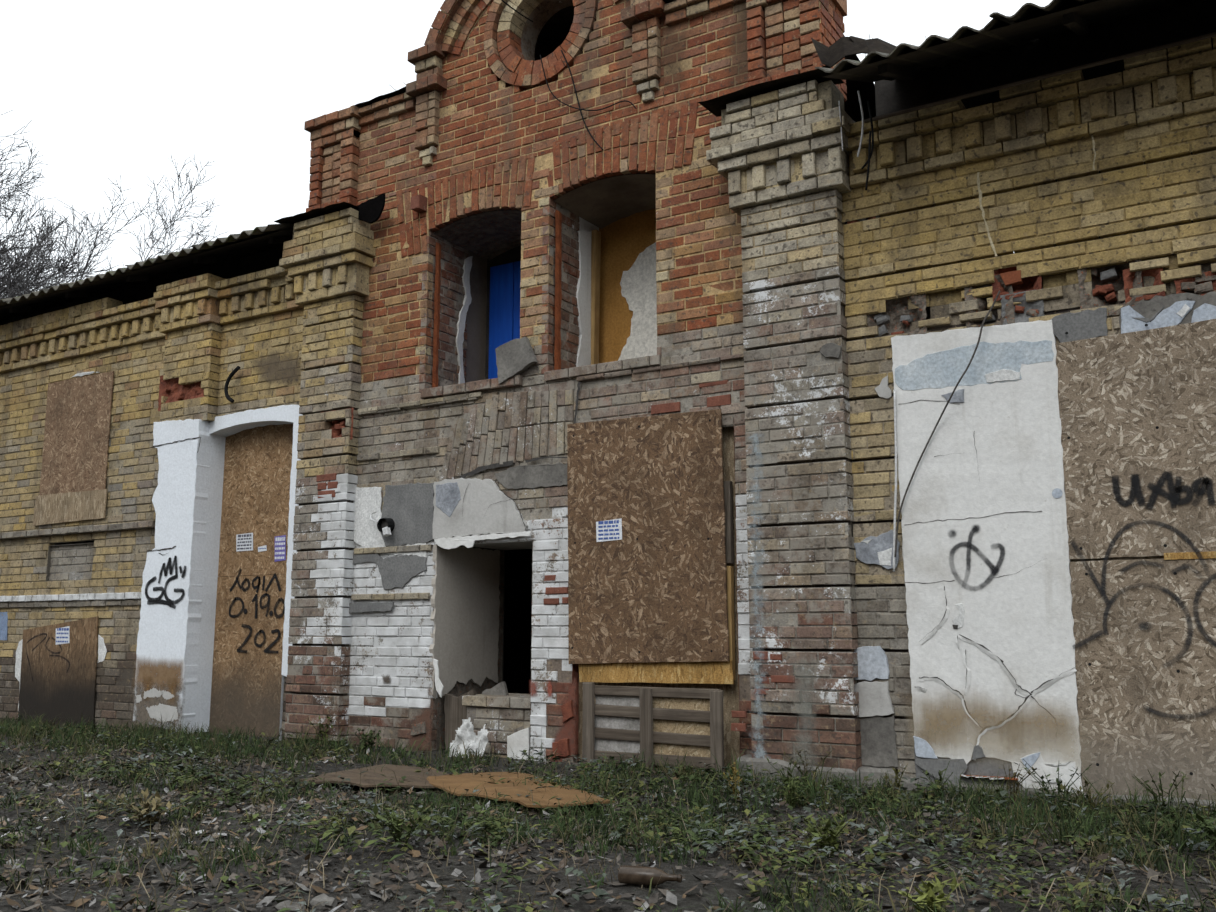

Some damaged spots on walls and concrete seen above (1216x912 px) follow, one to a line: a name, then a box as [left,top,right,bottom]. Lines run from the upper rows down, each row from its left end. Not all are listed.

spalling [863,293,927,339]
peeling [895,266,1054,403]
spalling [1077,249,1216,334]
spalling [158,375,210,411]
flaking render [316,473,338,498]
peeling [353,482,531,557]
flaking render [544,575,568,605]
water stain [130,661,182,731]
spalling [550,678,578,763]
crack [905,580,1077,761]
water stain [923,702,1071,753]